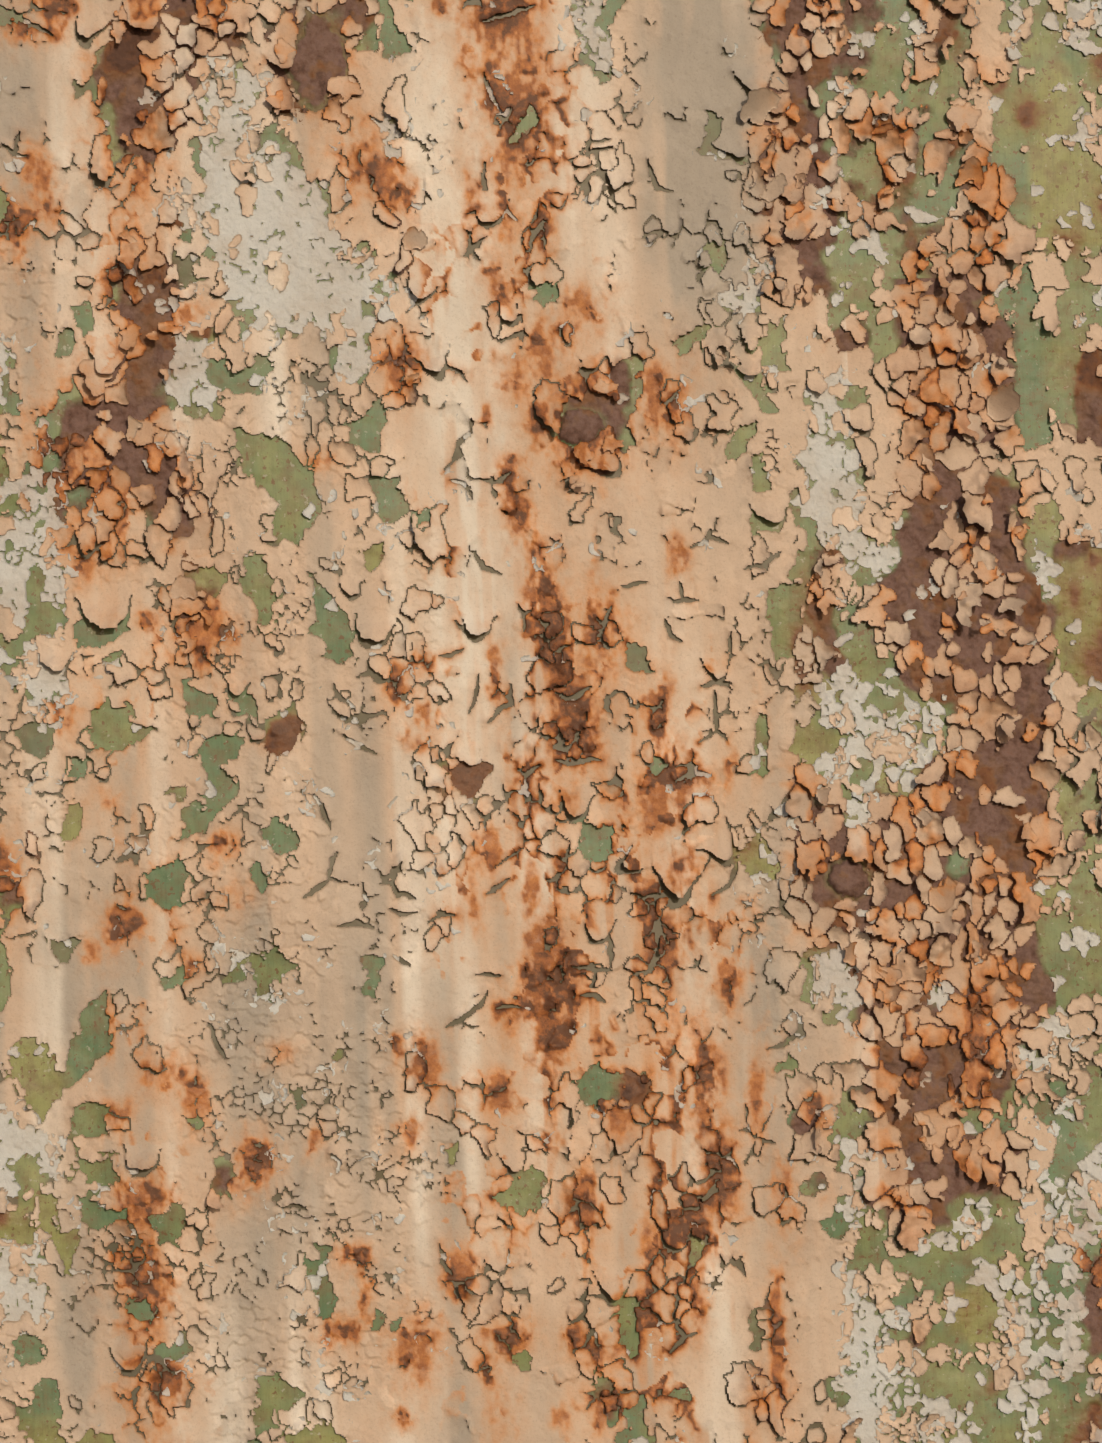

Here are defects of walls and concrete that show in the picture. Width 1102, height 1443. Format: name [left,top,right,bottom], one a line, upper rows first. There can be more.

corrosion [82,23,163,86]
corrosion [428,0,560,314]
peeling [0,140,451,910]
corrosion [480,281,695,825]
peeling [661,0,1102,1263]
peeling [0,802,114,1012]
crack [208,1022,229,1059]
corrosion [489,856,590,1108]
corrosion [610,667,768,1236]
peeling [0,990,144,1443]
crack [279,1203,307,1212]
peeling [906,1287,1002,1352]